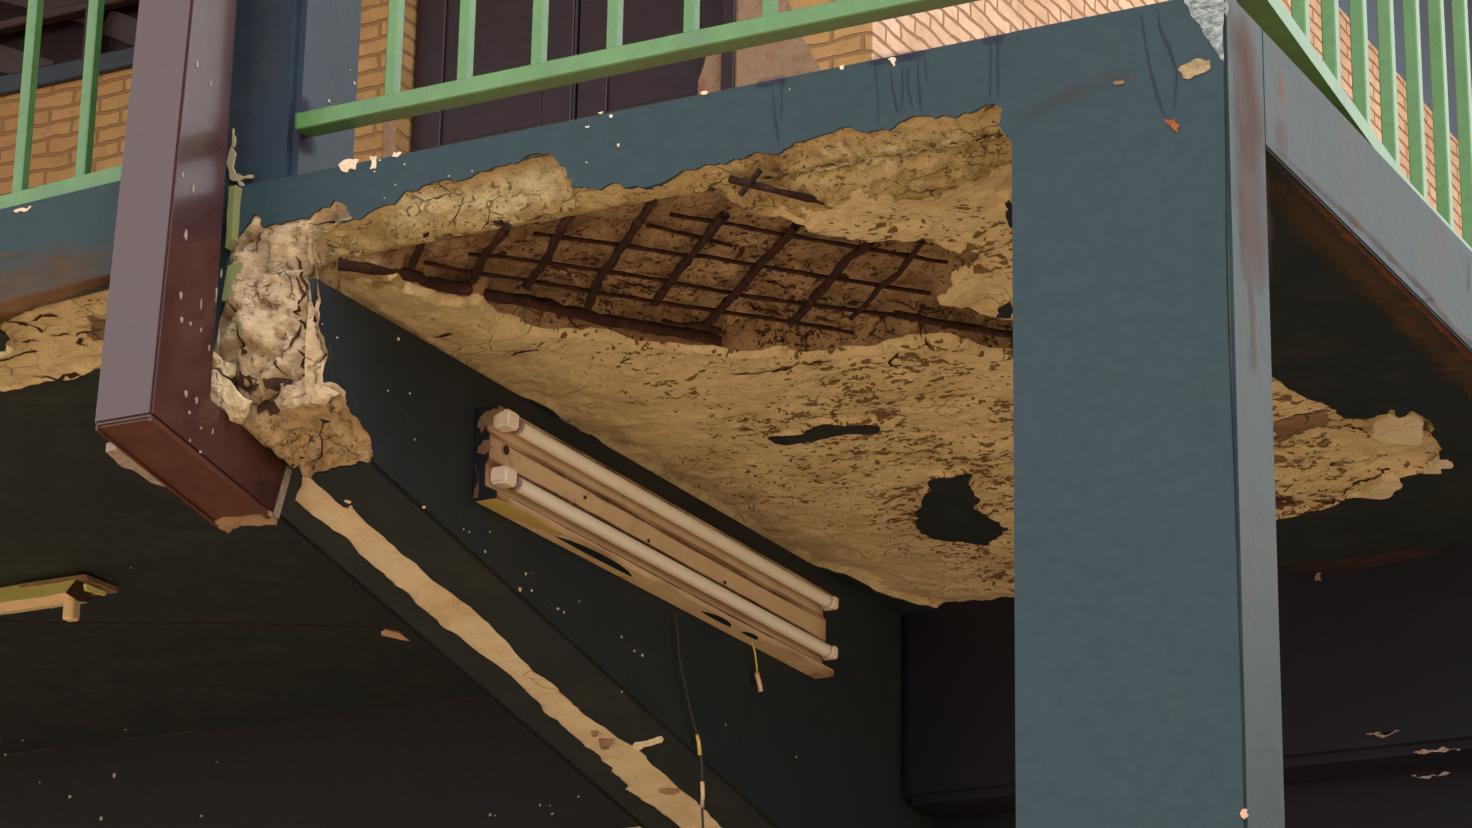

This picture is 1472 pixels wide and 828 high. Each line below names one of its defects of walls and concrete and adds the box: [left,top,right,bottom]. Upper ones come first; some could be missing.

peeling [0,289,109,392]
spalling [180,105,1014,828]
spalling [1272,377,1453,520]
peeling [1413,746,1460,754]